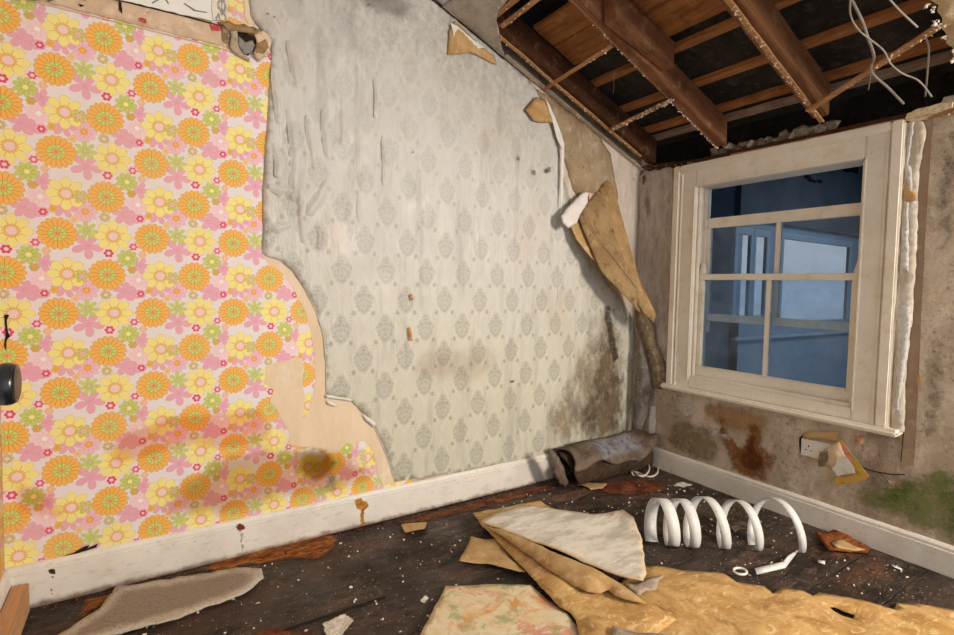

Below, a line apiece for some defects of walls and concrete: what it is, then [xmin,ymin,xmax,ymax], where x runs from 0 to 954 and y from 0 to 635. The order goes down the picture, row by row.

spalling [28,0,272,62]
peeling [262,254,396,485]
peeling [526,80,657,323]
leakage [555,167,673,437]
rust [720,422,776,480]